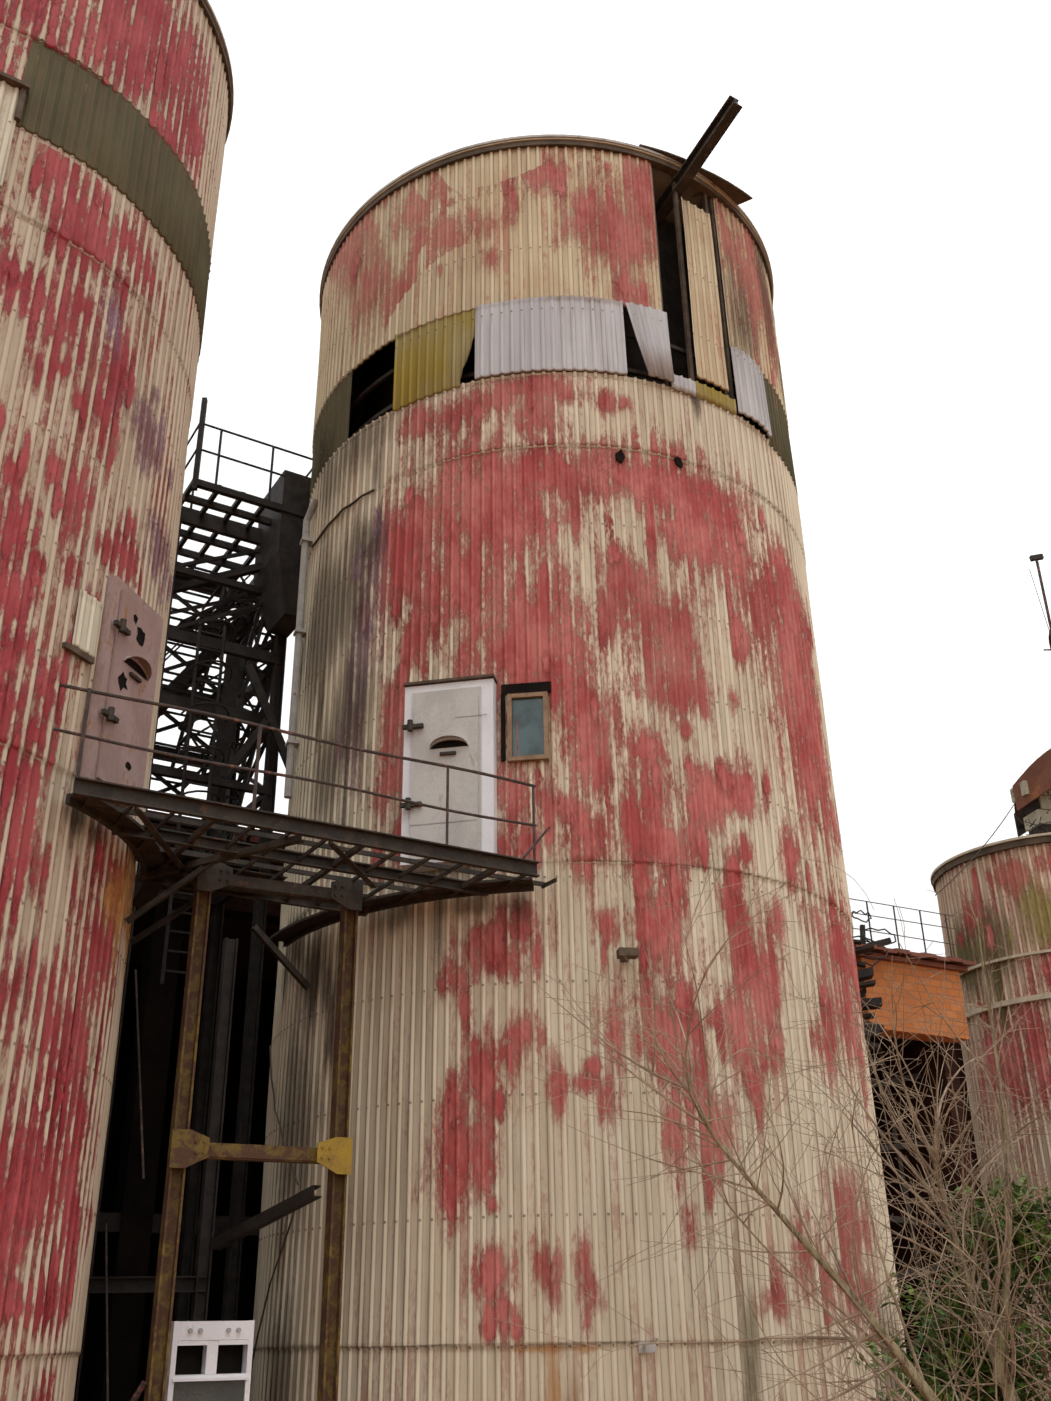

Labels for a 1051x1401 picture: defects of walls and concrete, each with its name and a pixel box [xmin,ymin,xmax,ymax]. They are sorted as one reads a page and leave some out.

peeling [0,0,214,190]
peeling [330,147,658,328]
peeling [715,202,779,387]
peeling [0,142,174,1401]
peeling [361,373,869,1248]
peeling [958,847,1051,952]
peeling [968,937,1051,1132]
peeling [465,1235,601,1346]